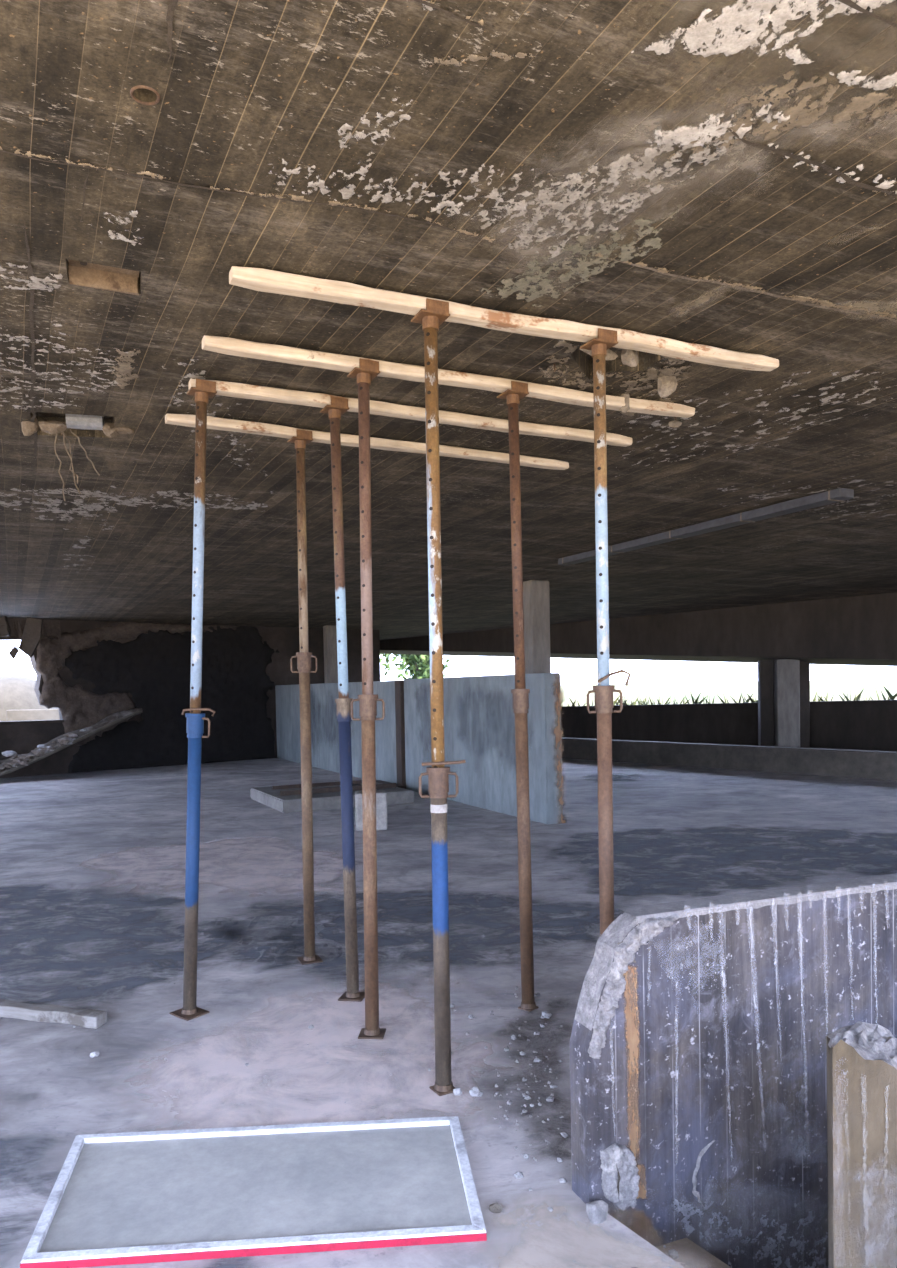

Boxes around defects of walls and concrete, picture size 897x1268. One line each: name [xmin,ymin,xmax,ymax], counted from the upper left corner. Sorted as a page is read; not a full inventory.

spalling [267,0,897,307]
damp [494,90,769,264]
spalling [35,622,238,746]
spalling [588,914,680,1063]
corrosion [623,965,659,1242]
damp [776,1076,844,1218]